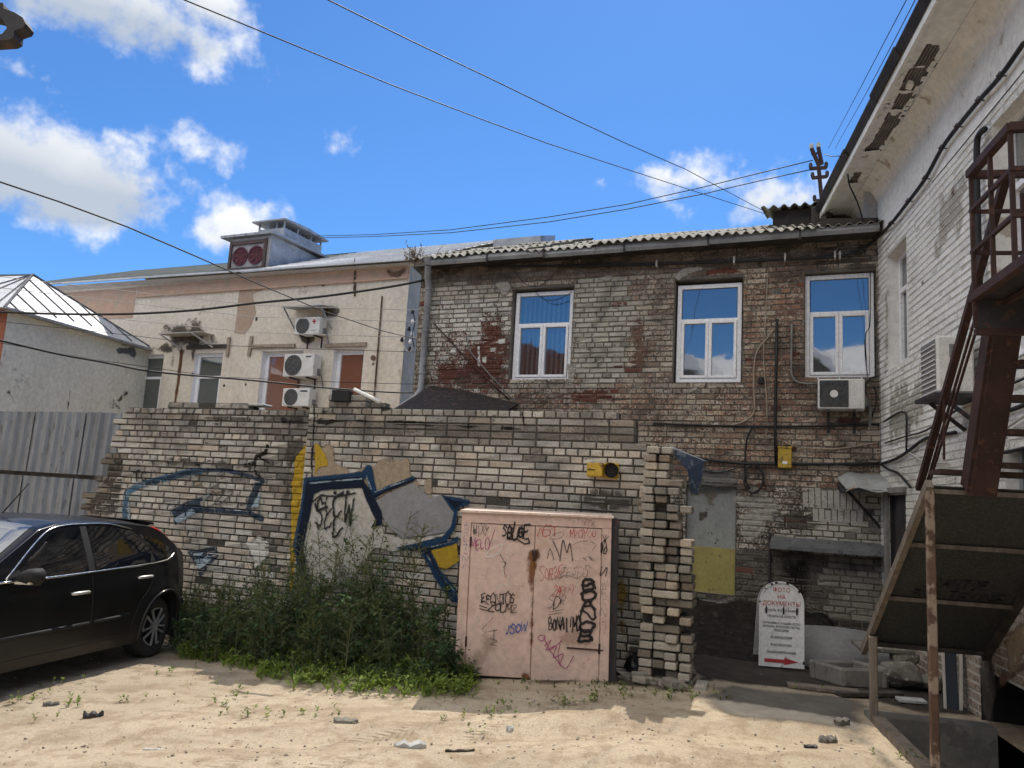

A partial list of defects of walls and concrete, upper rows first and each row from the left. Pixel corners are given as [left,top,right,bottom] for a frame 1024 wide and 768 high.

flaking render [877,61,937,120]
peeling [235,289,262,334]
peeling [438,317,508,382]
flaking render [290,443,454,588]
rust [527,550,540,590]